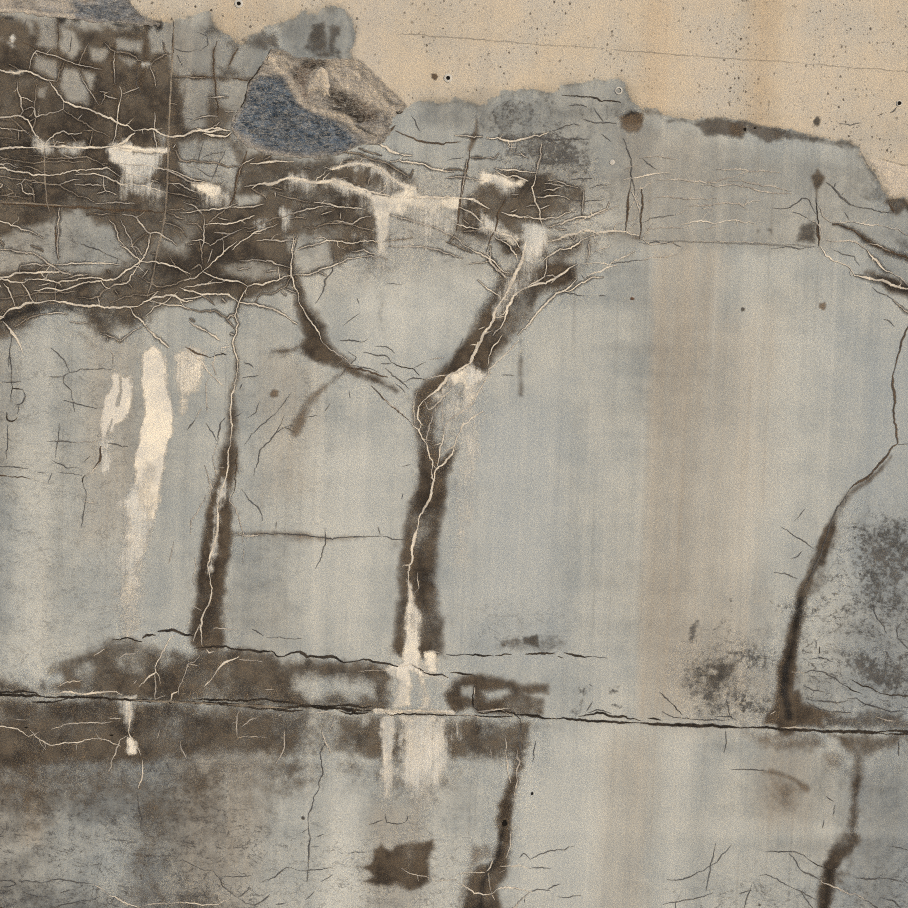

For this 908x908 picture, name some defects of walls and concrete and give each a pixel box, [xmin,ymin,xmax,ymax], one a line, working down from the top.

spalling [0,0,160,27]
spalling [230,49,407,159]
damp [812,170,825,189]
spalling [869,158,908,199]
crack [695,182,908,313]
damp [0,15,589,908]
crack [0,32,792,771]
crack [774,319,908,590]
damp [764,516,836,746]
crack [379,686,908,752]
crack [401,831,581,908]
damp [818,736,899,908]